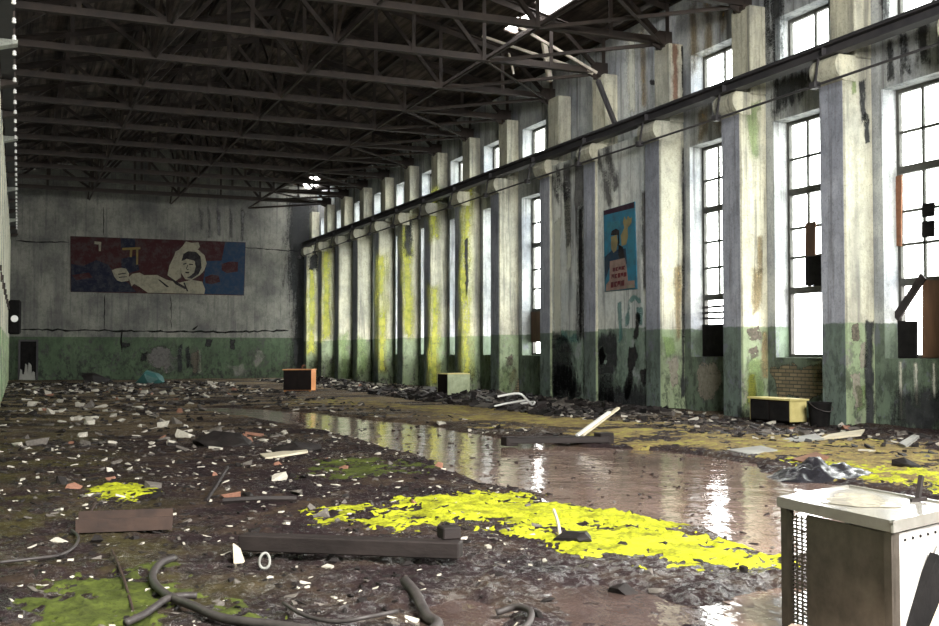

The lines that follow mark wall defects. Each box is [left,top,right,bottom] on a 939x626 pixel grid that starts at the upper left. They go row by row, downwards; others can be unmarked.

leakage [880,0,890,20]
peeling [140,343,199,374]
leakage [598,313,646,406]
flaking render [747,326,823,401]